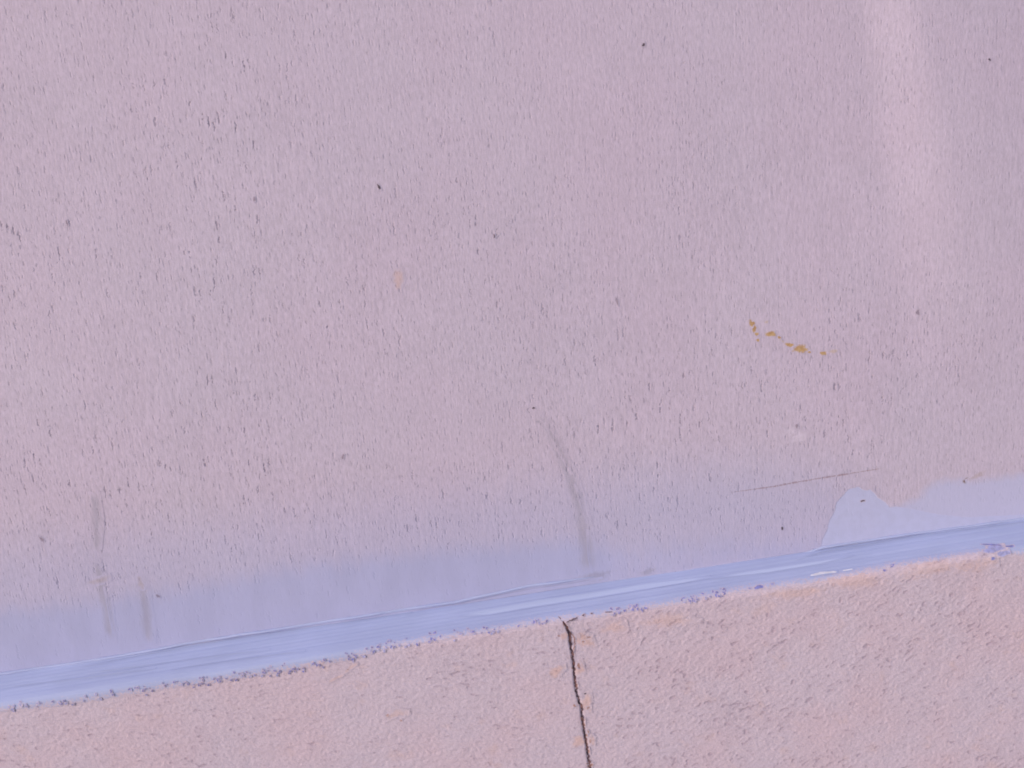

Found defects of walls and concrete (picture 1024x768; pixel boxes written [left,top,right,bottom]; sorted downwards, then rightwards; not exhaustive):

crack [558,611,613,768]